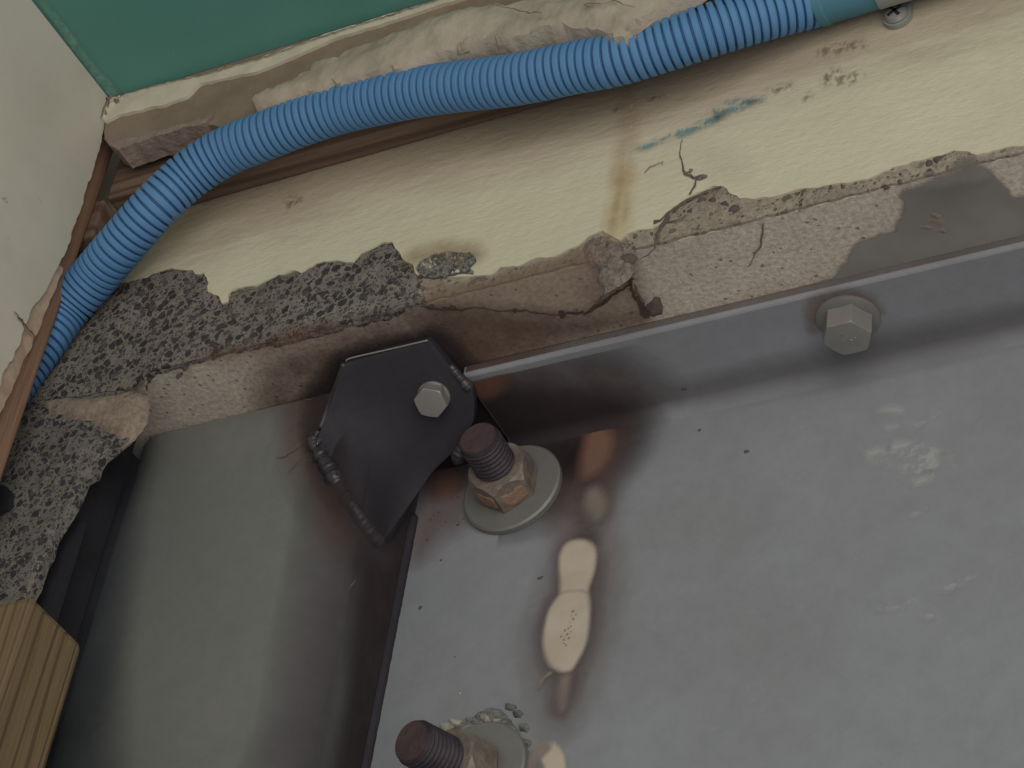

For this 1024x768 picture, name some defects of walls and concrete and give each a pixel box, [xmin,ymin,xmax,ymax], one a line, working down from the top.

spalling [100,0,707,124]
spalling [26,147,1024,405]
crack [420,141,721,319]
crack [748,223,764,267]
water stain [813,158,1024,285]
spalling [0,410,140,768]